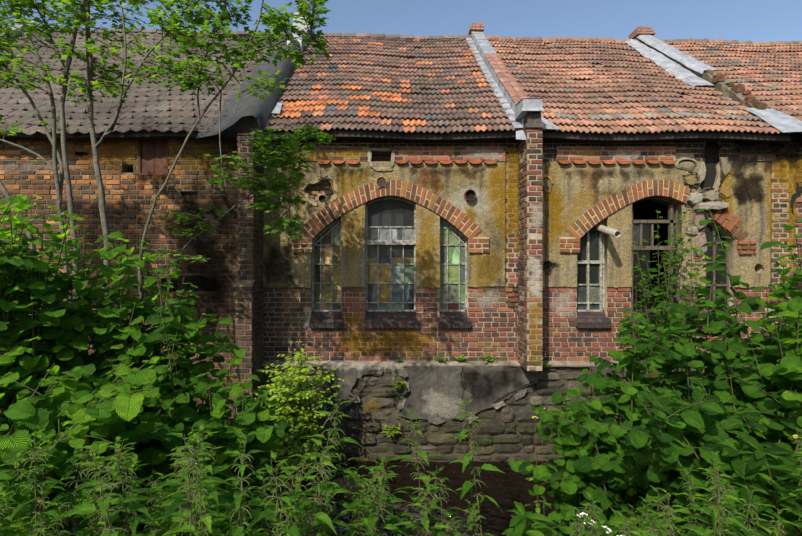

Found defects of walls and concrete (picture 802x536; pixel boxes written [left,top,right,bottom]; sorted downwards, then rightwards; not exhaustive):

spalling [301,170,338,207]
flaking render [697,162,706,185]
flaking render [719,157,731,199]
flaking render [693,214,707,256]
leakage [264,244,295,286]
flaking render [398,368,410,410]
flaking render [492,389,528,410]